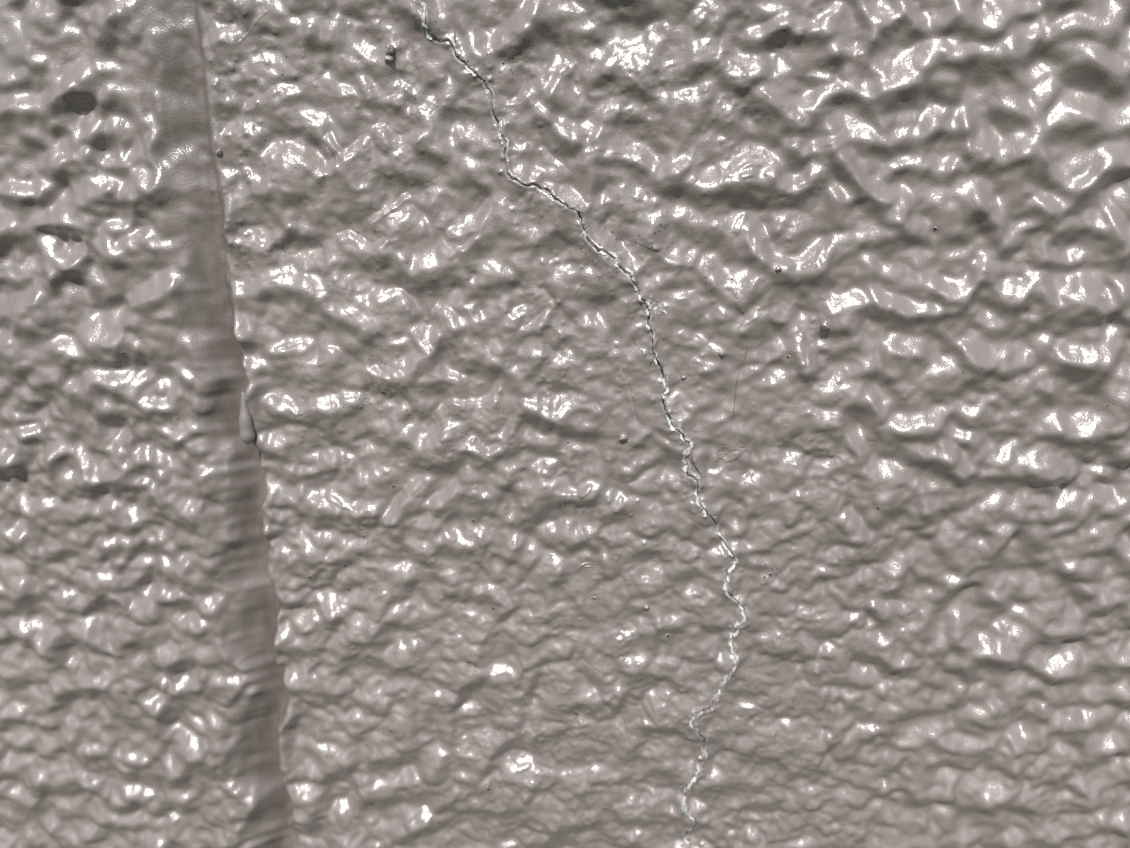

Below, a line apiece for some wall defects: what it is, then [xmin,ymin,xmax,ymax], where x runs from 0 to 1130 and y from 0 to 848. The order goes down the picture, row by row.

crack [417,0,750,848]